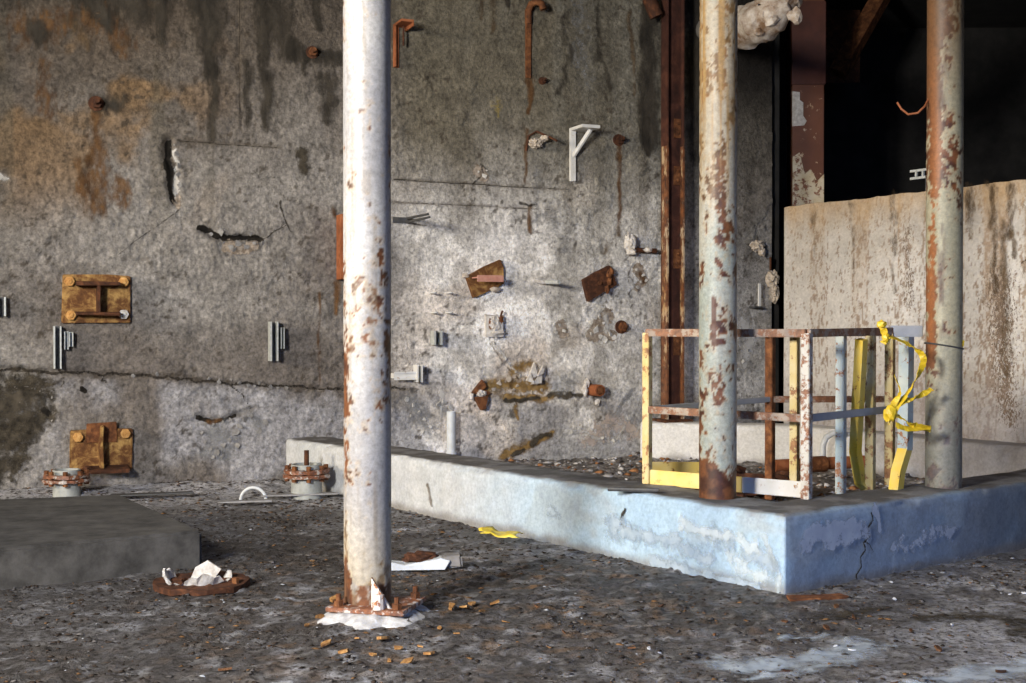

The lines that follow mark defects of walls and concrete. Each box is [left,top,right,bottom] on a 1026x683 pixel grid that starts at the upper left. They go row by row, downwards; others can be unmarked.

leakage [187,0,227,142]
leakage [243,0,343,129]
leakage [898,219,915,309]
leakage [0,367,57,484]
crack [0,367,344,429]
leakage [978,262,1026,435]
crack [856,512,874,579]